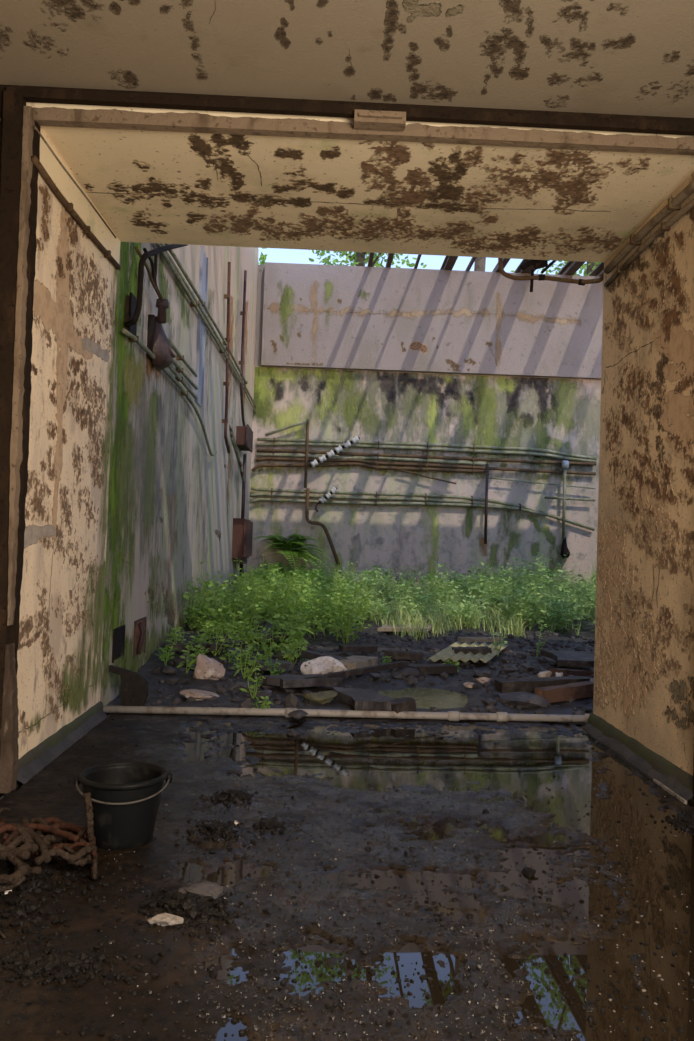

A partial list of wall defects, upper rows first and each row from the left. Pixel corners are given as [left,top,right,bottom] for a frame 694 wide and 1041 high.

peeling [0,0,141,59]
peeling [382,0,464,103]
peeling [479,0,636,108]
peeling [84,133,651,257]
peeling [17,184,115,723]
leakage [53,242,207,715]
leakage [253,367,283,418]
leakage [300,375,334,405]
leakage [465,500,473,537]
leakage [378,372,577,484]
leakage [484,510,561,578]
peeling [593,207,694,731]